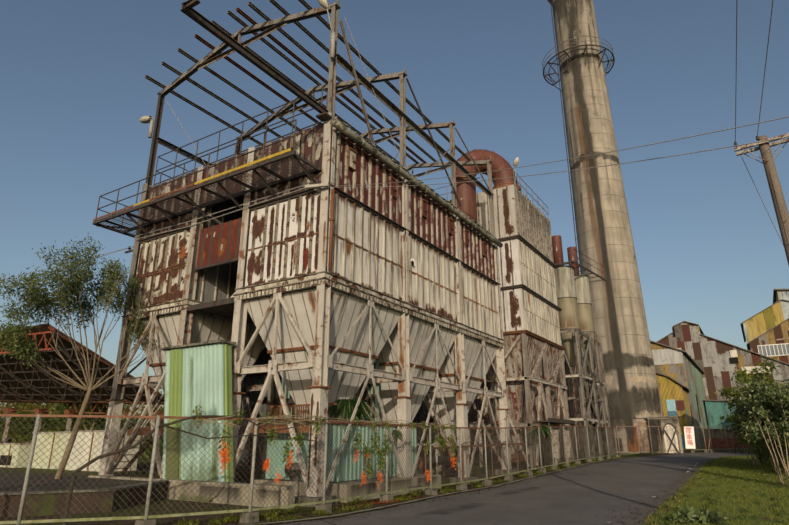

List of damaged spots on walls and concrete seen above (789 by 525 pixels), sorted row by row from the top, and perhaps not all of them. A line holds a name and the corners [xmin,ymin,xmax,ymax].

corrosion [273,242,309,271]
corrosion [323,214,497,313]
leakage [553,0,678,453]